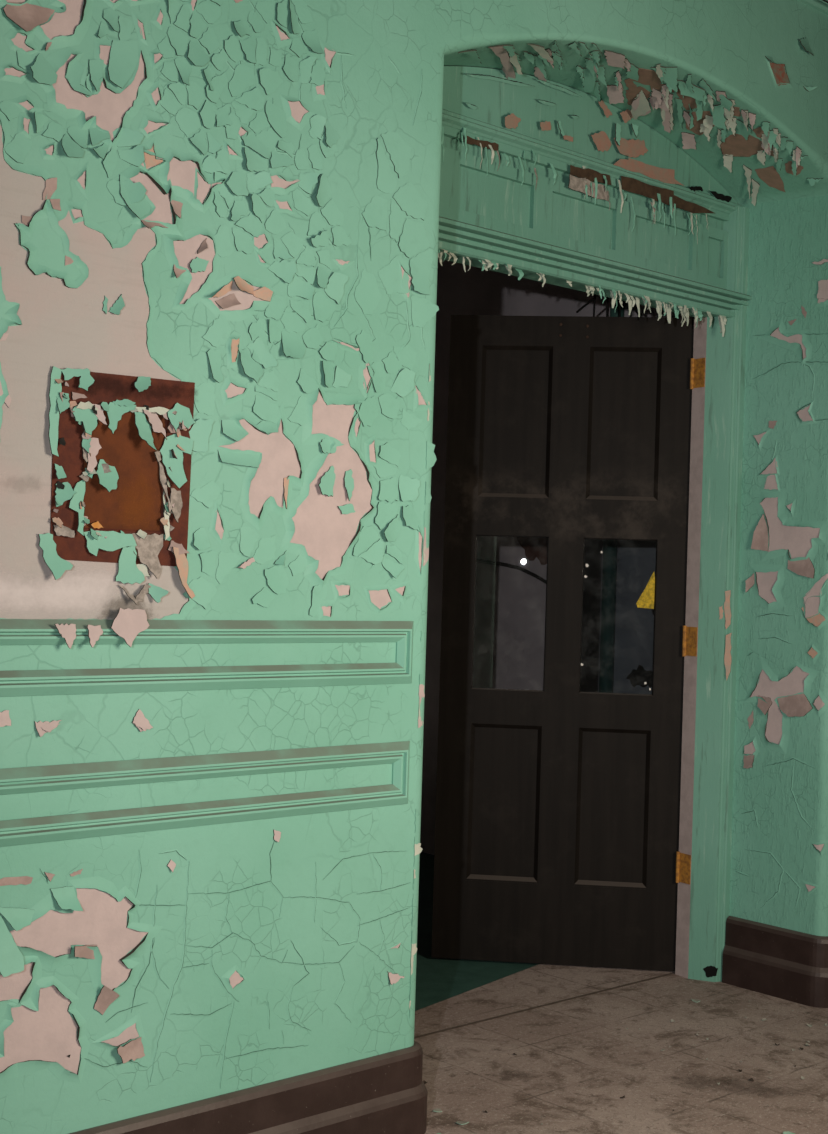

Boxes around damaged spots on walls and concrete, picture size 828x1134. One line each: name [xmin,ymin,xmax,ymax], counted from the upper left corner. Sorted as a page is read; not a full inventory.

peeling [458,40,823,244]
flaking render [0,0,557,649]
peeling [566,280,727,337]
peeling [760,280,828,367]
peeling [793,401,816,425]
peeling [745,454,828,630]
peeling [719,590,731,680]
peeling [742,643,828,769]
peeling [0,869,163,1084]
crack [84,840,409,1089]
peeling [386,809,423,1019]